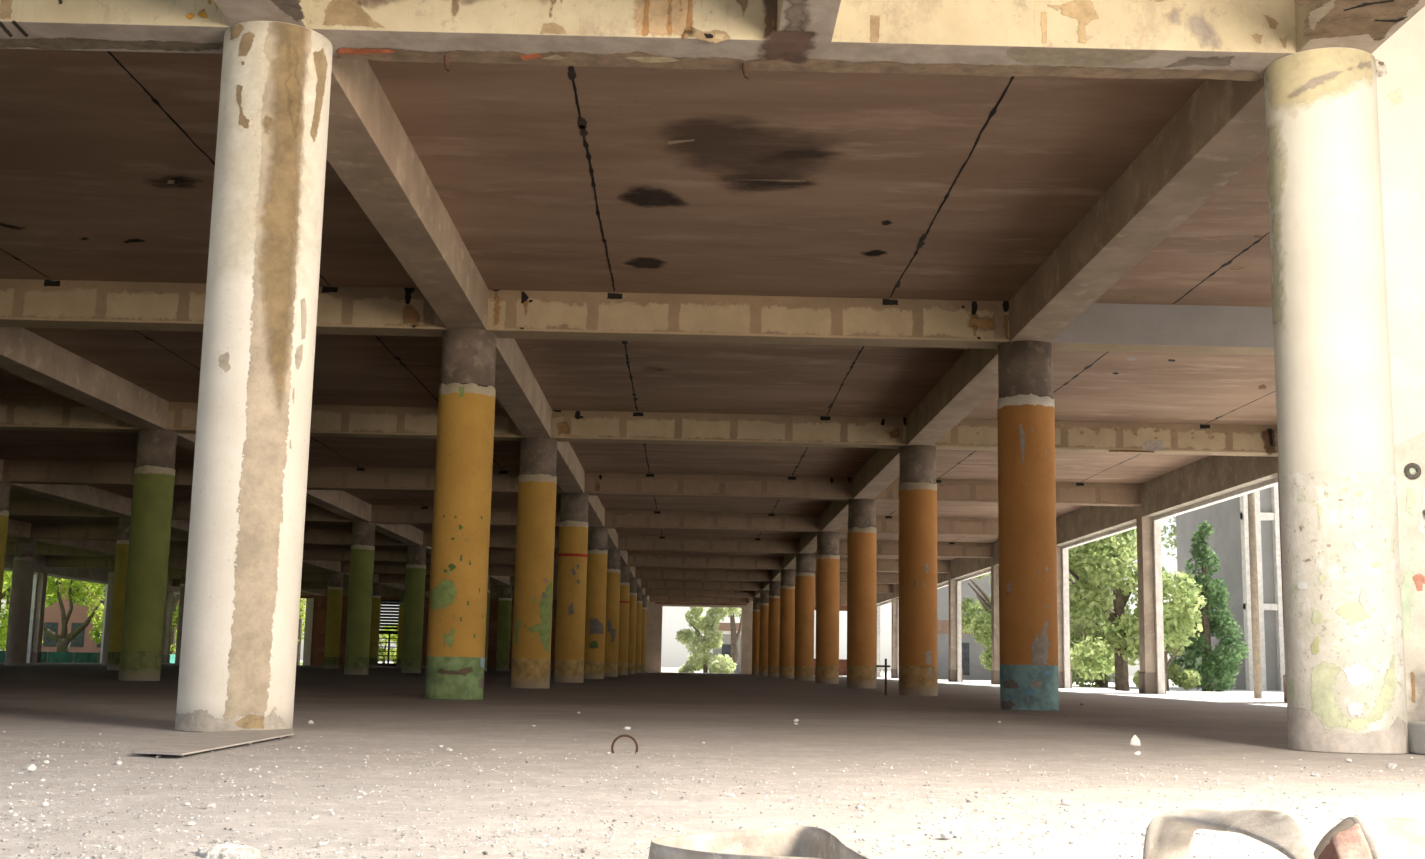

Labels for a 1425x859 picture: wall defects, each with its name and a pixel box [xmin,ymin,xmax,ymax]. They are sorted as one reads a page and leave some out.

leakage [737,0,816,63]
peeling [1252,15,1287,49]
flaking render [1294,0,1419,41]
spalling [1375,59,1387,78]
crack [567,66,623,299]
leakage [620,187,686,207]
leakage [667,122,820,190]
crack [882,76,1014,305]
leakage [626,258,665,269]
peeling [0,0,1274,732]
peeling [1282,431,1425,753]